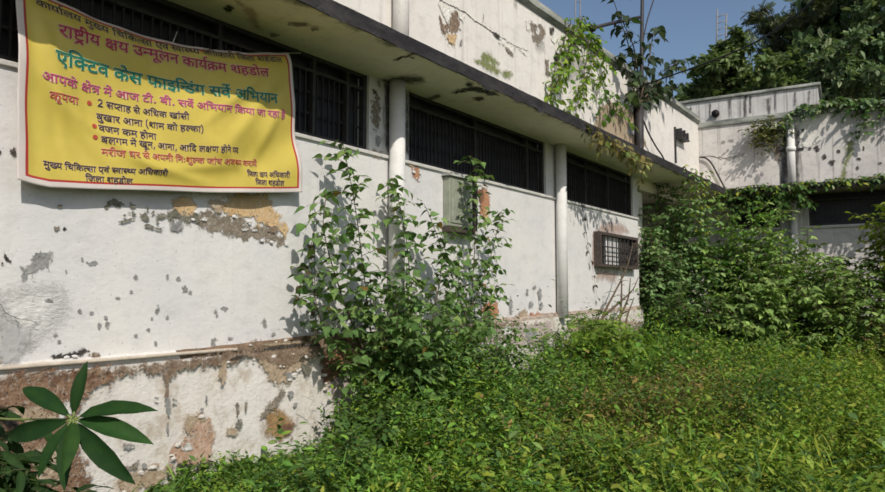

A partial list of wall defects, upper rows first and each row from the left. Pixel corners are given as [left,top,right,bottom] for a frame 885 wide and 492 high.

flaking render [439,1,466,46]
crack [440,0,528,55]
flaking render [526,19,546,46]
peeling [104,192,289,248]
peeling [1,251,53,282]
flaking render [0,333,134,453]
flaking render [29,447,93,492]
flaking render [117,395,248,492]